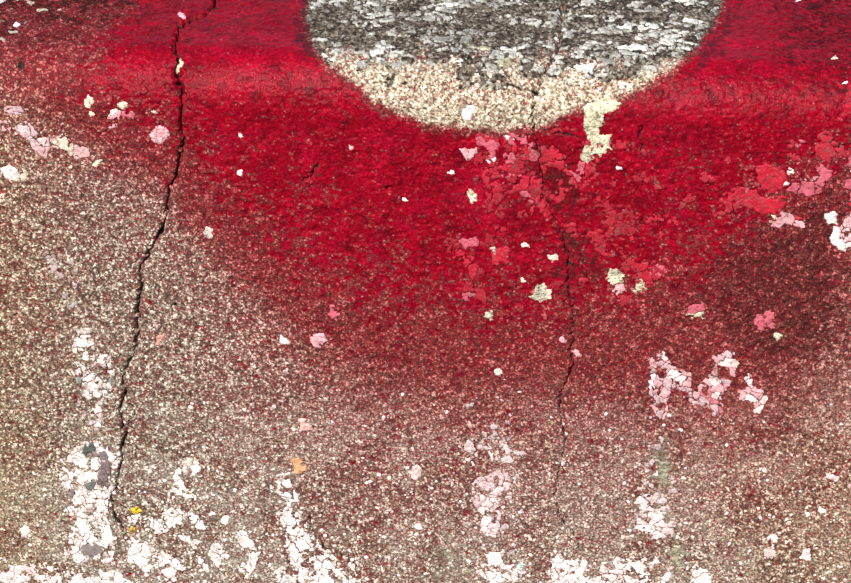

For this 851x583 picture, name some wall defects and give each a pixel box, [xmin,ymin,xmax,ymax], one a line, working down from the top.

crack [500,12,563,171]
crack [112,0,216,529]
peeling [443,132,651,304]
peeling [784,130,851,252]
peeling [648,350,768,420]
peeling [0,441,133,583]
peeling [124,537,186,581]
peeling [129,508,229,577]
peeling [272,472,357,583]
peeling [464,421,527,583]
peeling [547,552,672,583]
peeling [631,436,678,540]